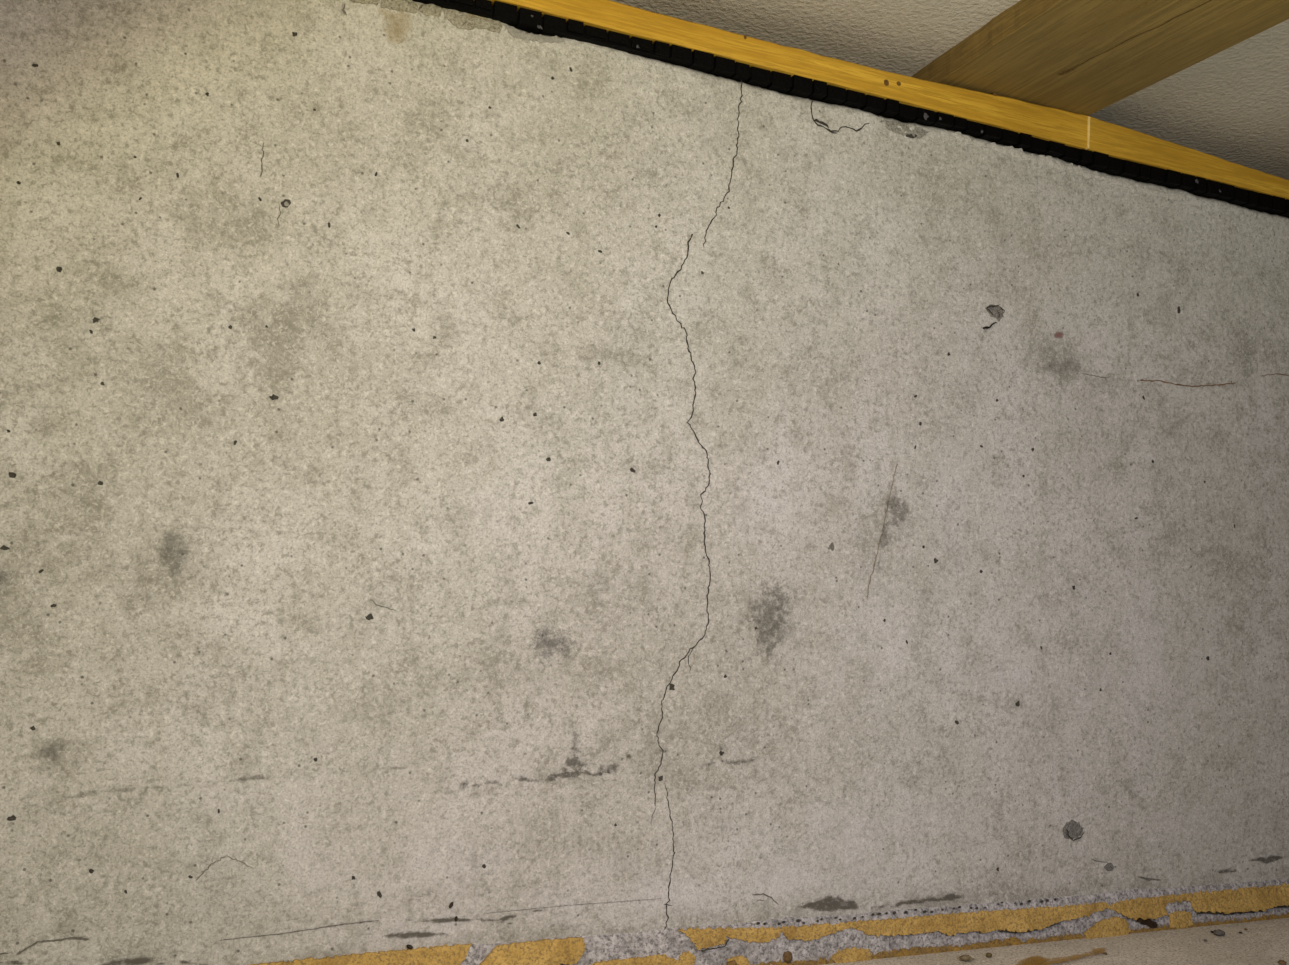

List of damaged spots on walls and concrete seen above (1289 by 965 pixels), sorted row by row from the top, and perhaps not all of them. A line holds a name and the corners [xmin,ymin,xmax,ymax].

crack [810,100,870,134]
crack [490,80,743,930]
crack [220,921,372,941]
peeling [251,883,1289,965]